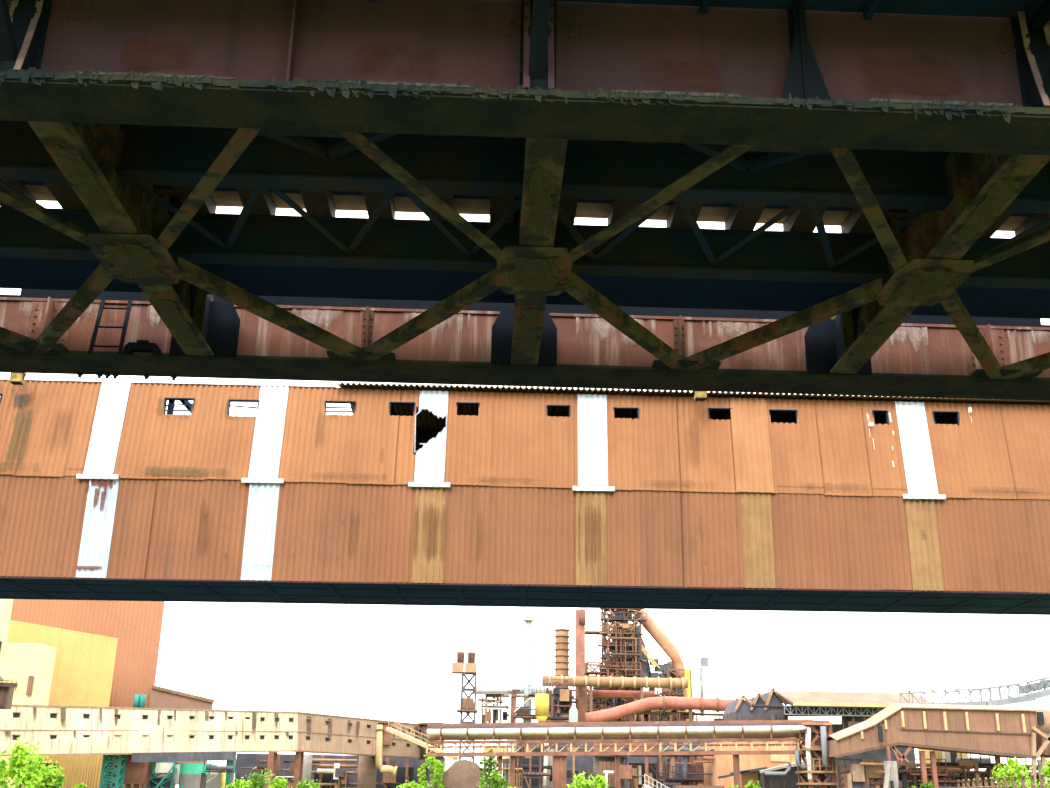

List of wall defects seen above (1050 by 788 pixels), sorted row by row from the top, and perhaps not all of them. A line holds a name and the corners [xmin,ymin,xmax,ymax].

water stain [0,394,32,470]